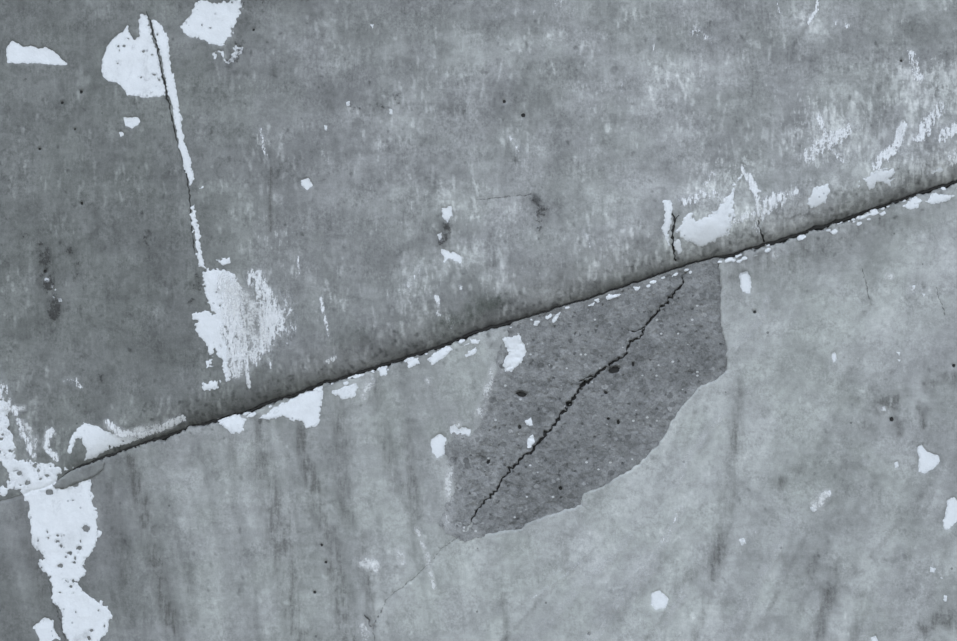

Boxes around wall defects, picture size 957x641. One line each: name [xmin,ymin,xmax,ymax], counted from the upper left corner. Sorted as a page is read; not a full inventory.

peeling [6,41,67,65]
peeling [101,14,204,189]
crack [146,12,195,254]
peeling [180,0,243,64]
damp [678,172,726,206]
damp [733,166,799,233]
damp [803,114,852,163]
damp [872,121,907,171]
peeling [189,206,242,391]
crack [364,213,684,638]
spalling [431,258,727,542]
flaking render [0,389,113,641]